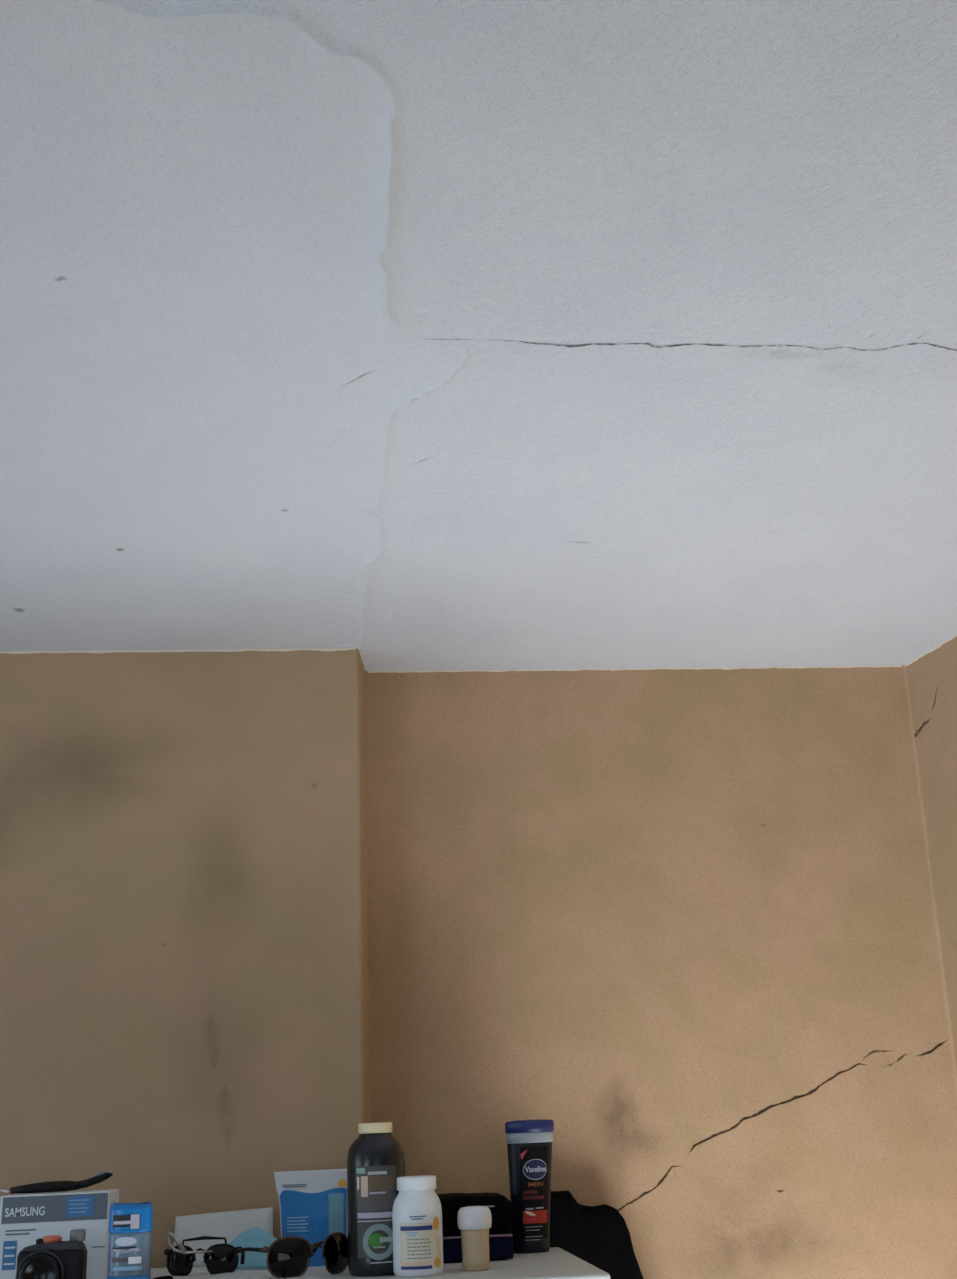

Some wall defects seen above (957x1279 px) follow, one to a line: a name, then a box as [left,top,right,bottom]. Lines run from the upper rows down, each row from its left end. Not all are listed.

crack [407,325,957,351]
crack [618,1040,947,1211]